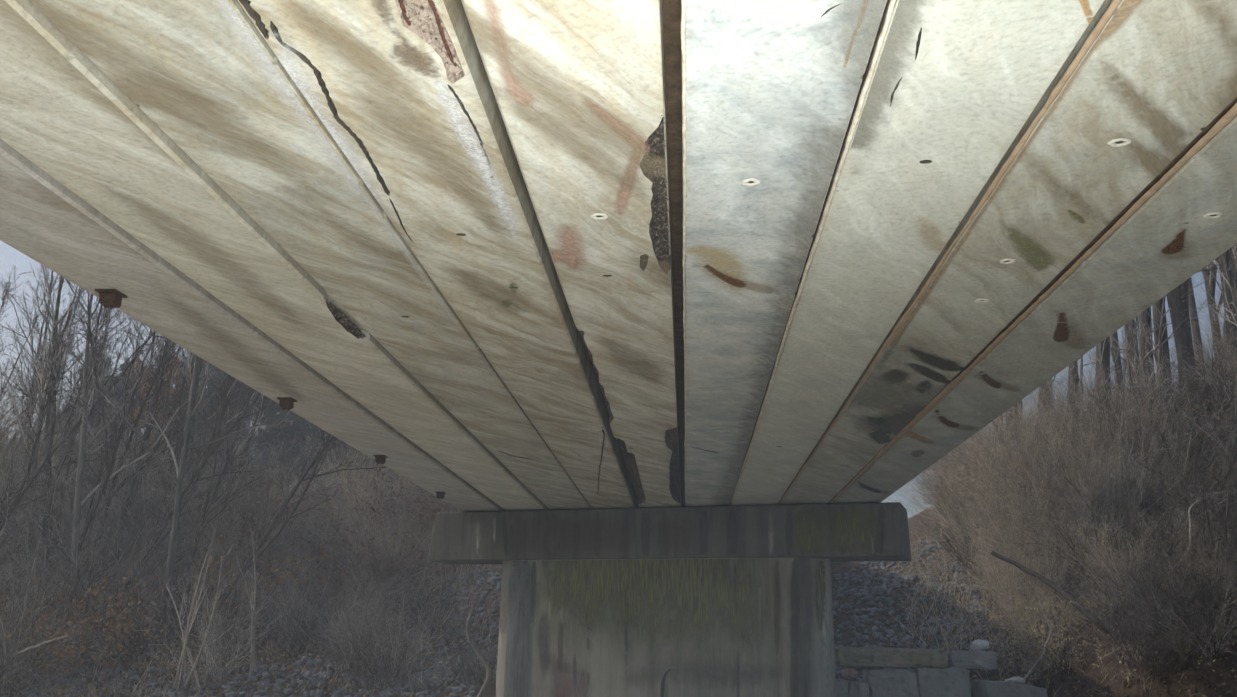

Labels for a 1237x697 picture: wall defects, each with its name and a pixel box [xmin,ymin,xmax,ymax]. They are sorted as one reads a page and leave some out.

spalling [395,0,465,84]
crack [239,0,412,241]
crack [447,84,495,185]
corrosion [589,104,646,214]
spalling [639,115,670,274]
corrosion [884,0,1142,360]
corrosion [551,228,580,269]
corrosion [693,247,745,288]
corrosion [1162,230,1185,256]
spalling [326,299,366,339]
damp [850,349,965,443]
spalling [665,427,680,503]